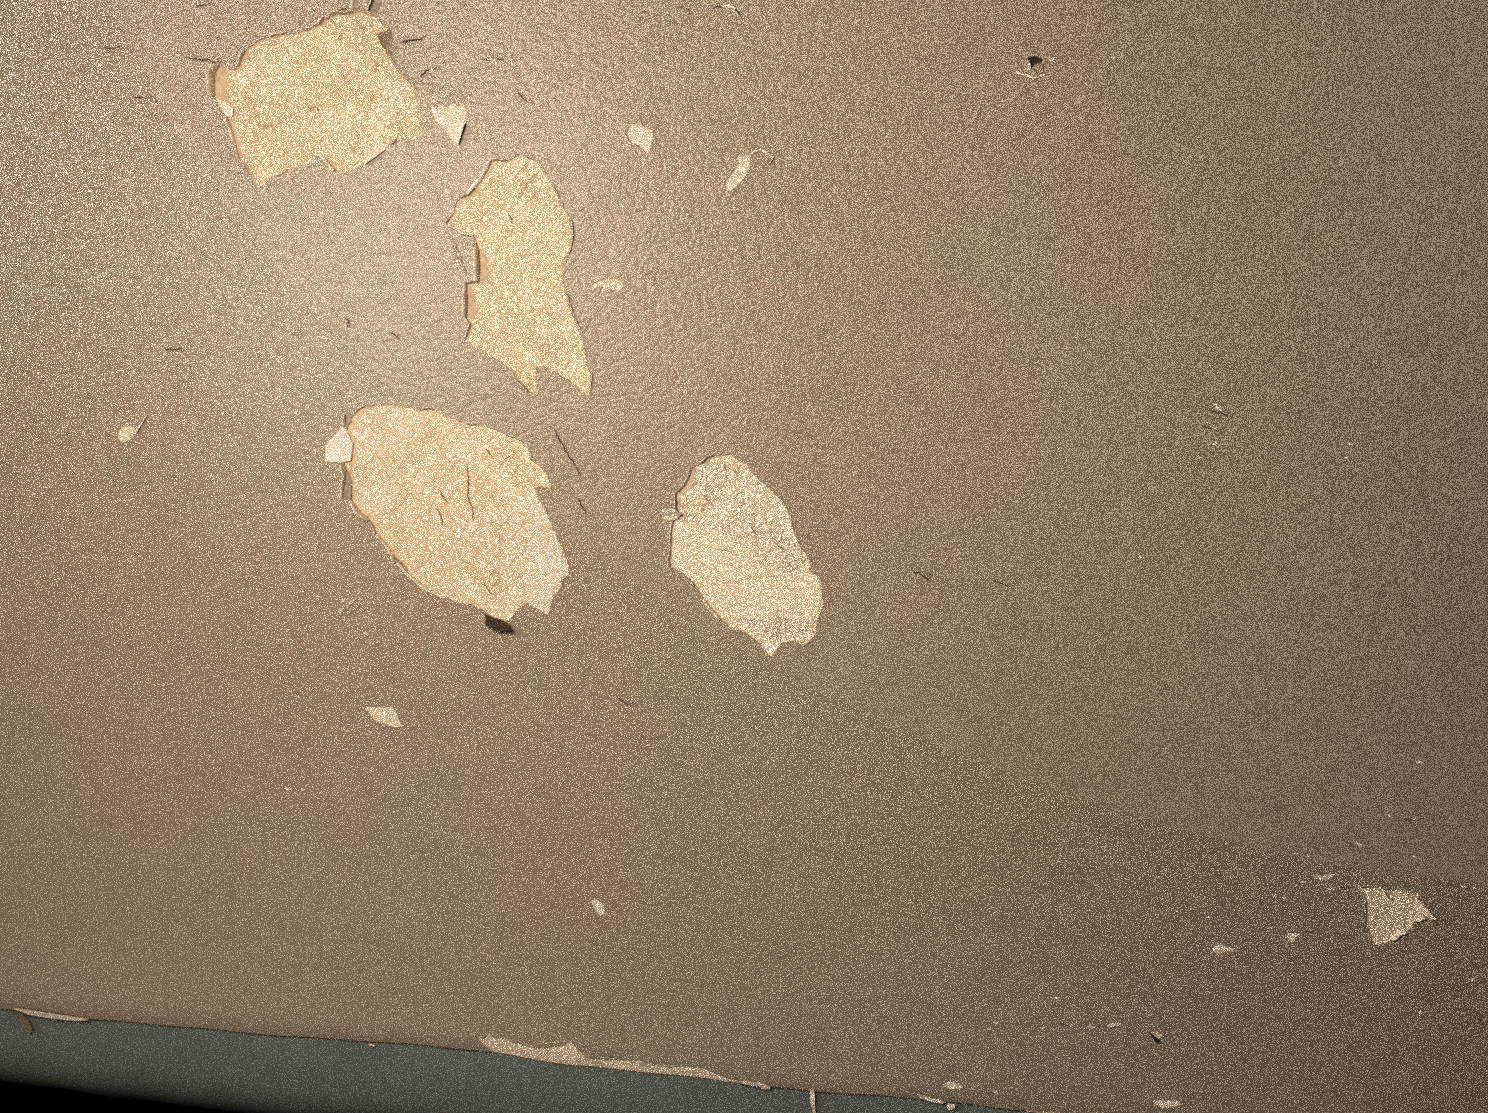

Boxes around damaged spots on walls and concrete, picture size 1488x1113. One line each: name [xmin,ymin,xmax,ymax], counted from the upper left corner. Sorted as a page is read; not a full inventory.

peeling [205,0,466,188]
peeling [624,123,653,152]
peeling [725,149,774,190]
peeling [444,154,592,395]
peeling [590,278,623,294]
peeling [325,404,570,631]
peeling [661,454,823,656]
peeling [366,706,402,727]
peeling [1242,927,1318,942]
peeling [1273,874,1436,944]
peeling [474,1032,737,1083]